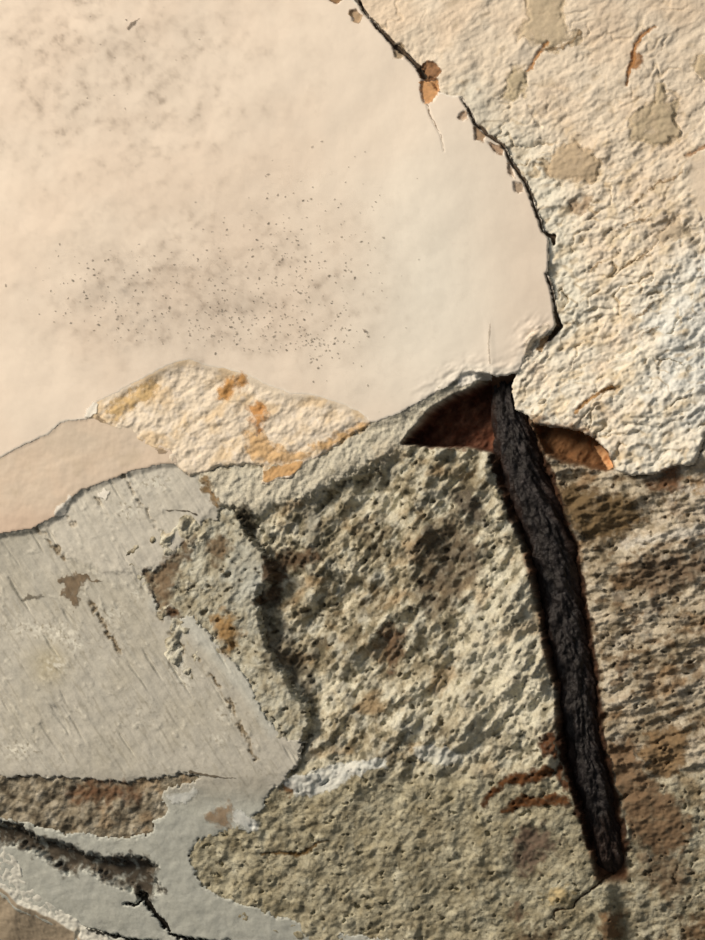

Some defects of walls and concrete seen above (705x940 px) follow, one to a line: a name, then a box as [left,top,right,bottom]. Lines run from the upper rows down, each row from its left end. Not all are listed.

crack [526,30,582,71]
crack [330,0,556,246]
flaking render [354,0,705,476]
crack [536,273,563,352]
crack [574,386,615,414]
rust [488,453,523,528]
spalling [0,359,705,940]
rust [480,728,596,850]
crack [0,821,231,940]